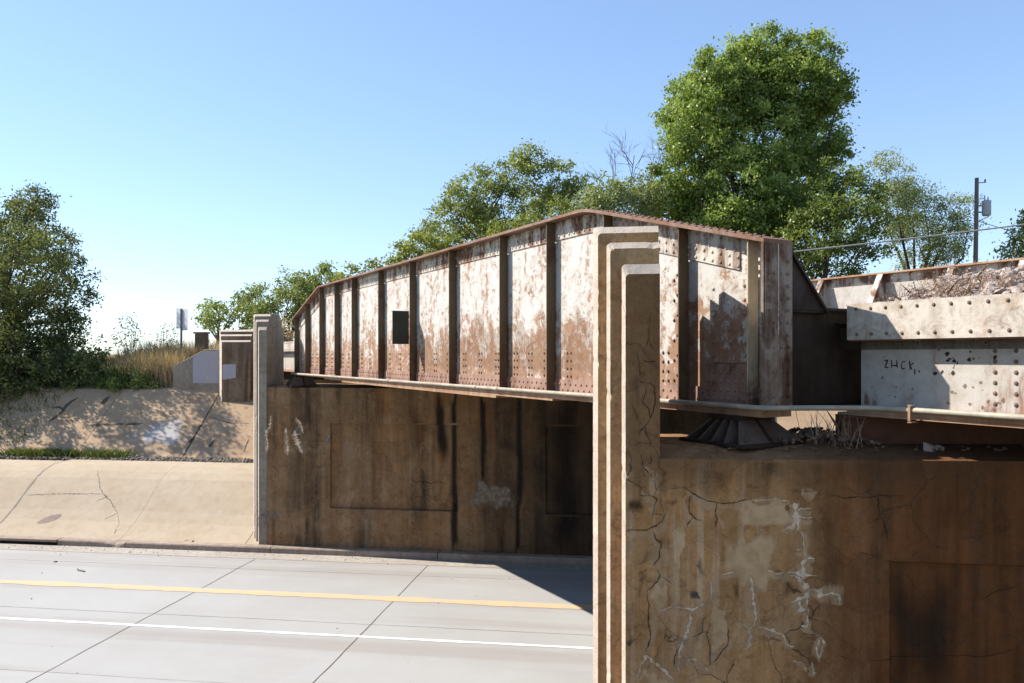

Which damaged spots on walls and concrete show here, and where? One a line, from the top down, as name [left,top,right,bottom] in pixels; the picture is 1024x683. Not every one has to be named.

water stain [285,419,303,454]
crack [33,470,119,534]
water stain [437,394,458,545]
crack [626,314,748,652]
crack [706,627,729,665]